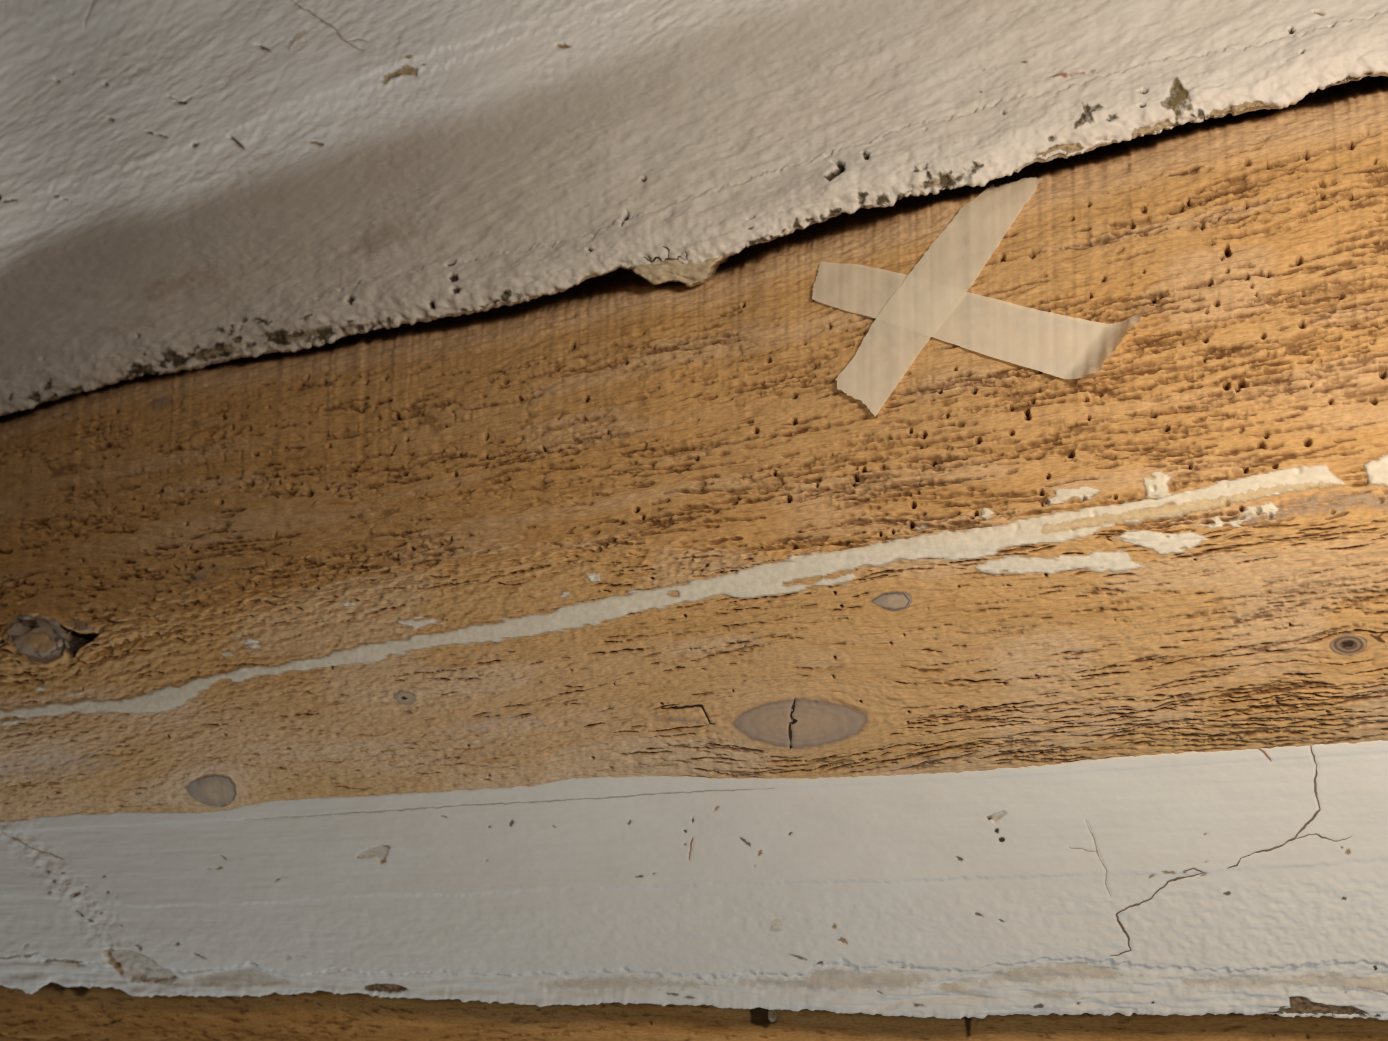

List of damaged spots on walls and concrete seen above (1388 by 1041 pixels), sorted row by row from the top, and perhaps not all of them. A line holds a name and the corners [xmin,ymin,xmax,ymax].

flaking render [632,256,730,287]
peeling [1044,486,1100,506]
peeling [1144,472,1171,499]
peeling [975,502,1278,574]
peeling [397,617,443,629]
peeling [222,637,260,657]
crack [1069,746,1350,956]